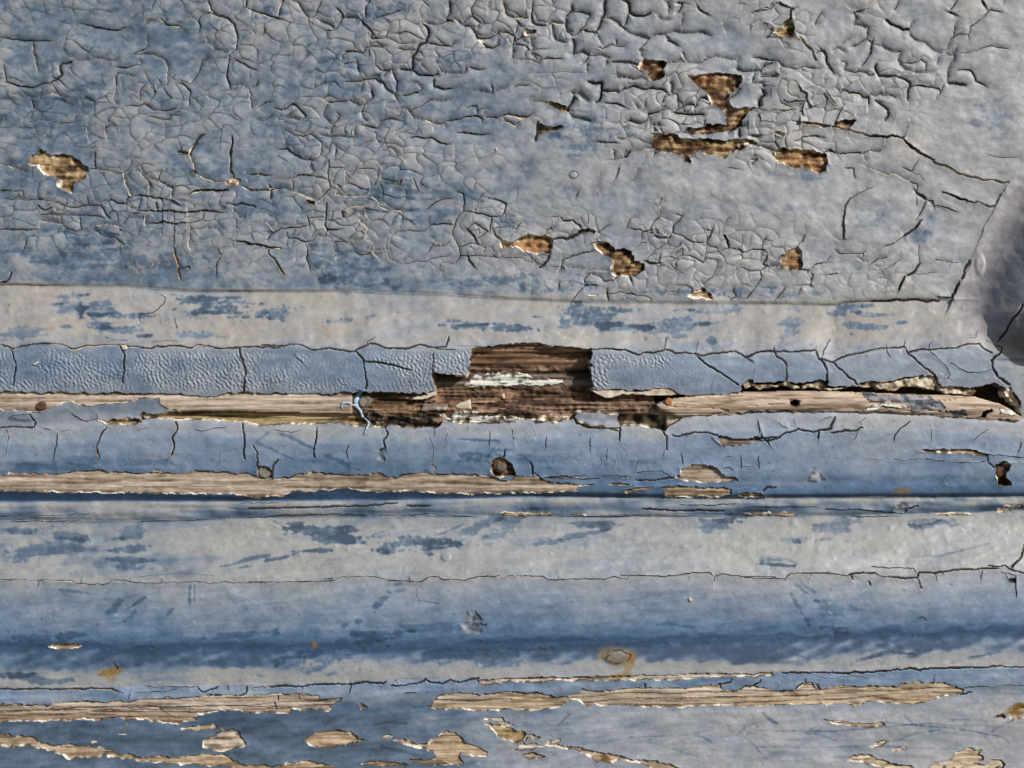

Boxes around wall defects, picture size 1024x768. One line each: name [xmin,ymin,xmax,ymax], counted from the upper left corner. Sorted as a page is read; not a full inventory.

peeling [651,72,757,163]
peeling [27,149,89,194]
peeling [773,131,828,174]
crack [0,0,1023,405]
peeling [499,233,554,255]
peeling [578,228,645,277]
peeling [0,342,1022,432]
peeling [0,449,594,499]
crack [0,546,1024,598]
peeling [0,693,342,768]
peeling [361,730,488,767]
peeling [426,671,964,768]